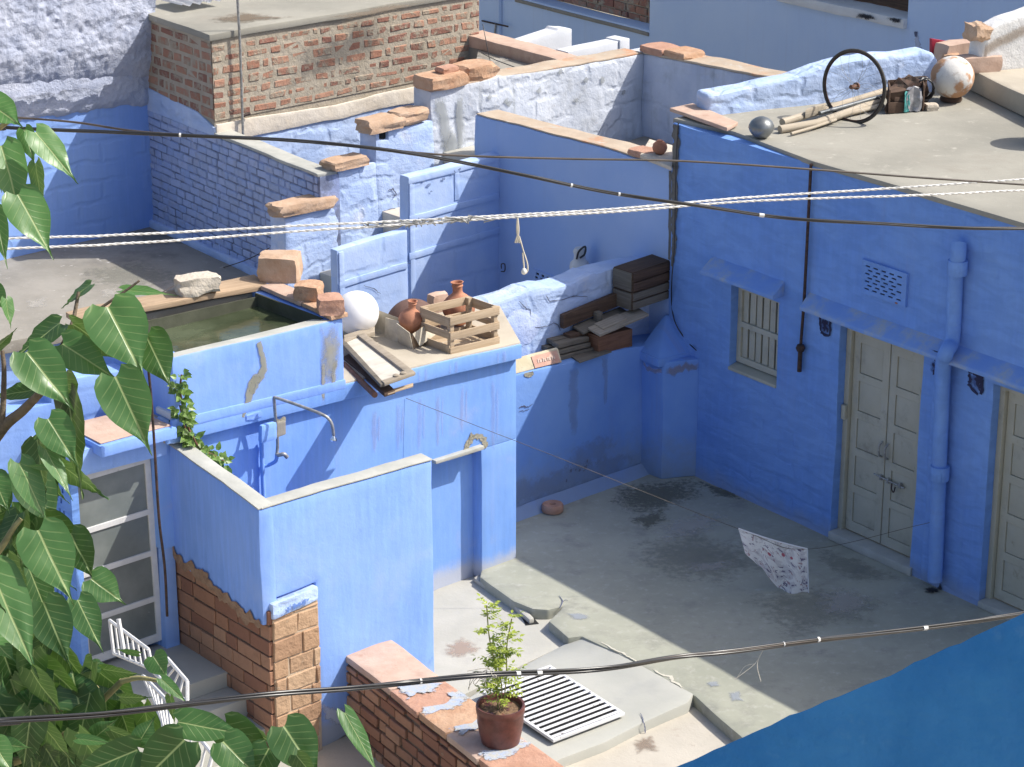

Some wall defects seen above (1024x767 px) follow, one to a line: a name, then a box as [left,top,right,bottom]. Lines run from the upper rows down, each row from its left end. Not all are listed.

flaking render [172,546,260,628]